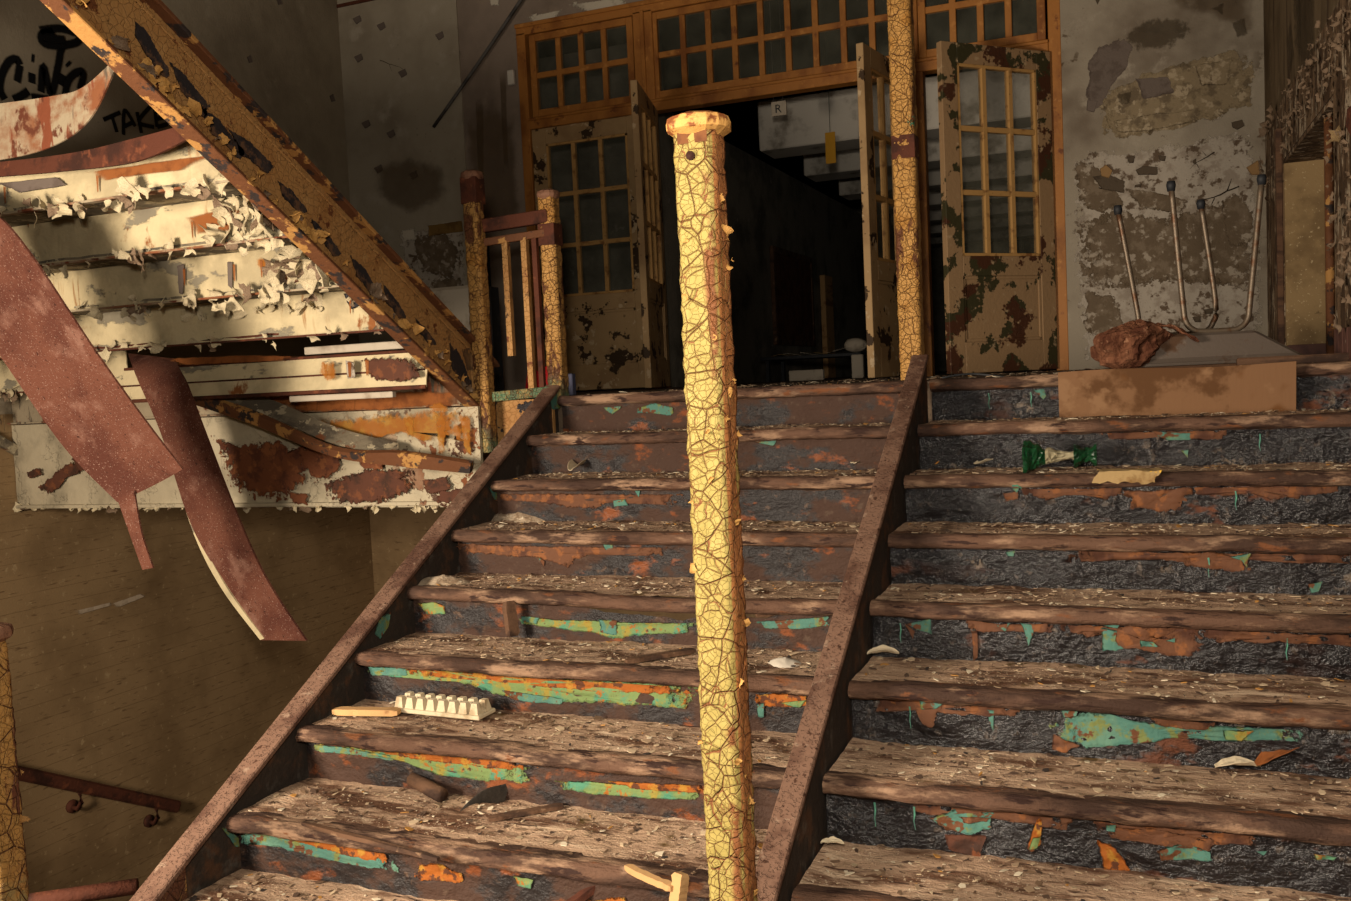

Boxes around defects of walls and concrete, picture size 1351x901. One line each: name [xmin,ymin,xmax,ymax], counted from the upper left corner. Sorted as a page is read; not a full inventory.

rust [95,156,204,192]
flaking render [1073,8,1351,361]
peeling [0,22,479,399]
rust [269,357,471,453]
rust [27,458,84,494]
rust [211,435,461,506]
peeling [519,616,698,639]
peeling [368,667,698,709]
peeling [1049,710,1303,753]
peeling [314,744,538,784]
peeling [555,781,704,800]
peeling [1097,825,1220,871]